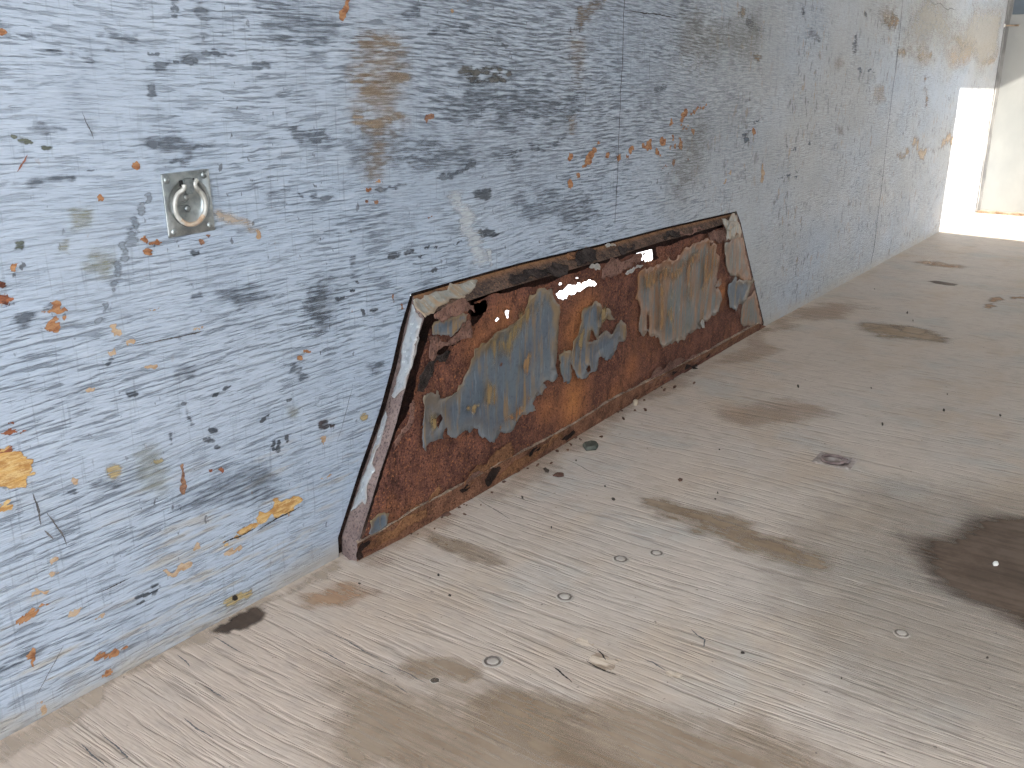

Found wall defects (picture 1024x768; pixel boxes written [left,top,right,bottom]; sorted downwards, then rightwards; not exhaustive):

peeling [567,103,707,189]
peeling [42,300,68,333]
damp [860,323,947,342]
peeling [0,422,36,512]
peeling [163,542,201,577]
peeling [223,496,303,556]
damp [643,498,829,570]
damp [912,517,1024,627]